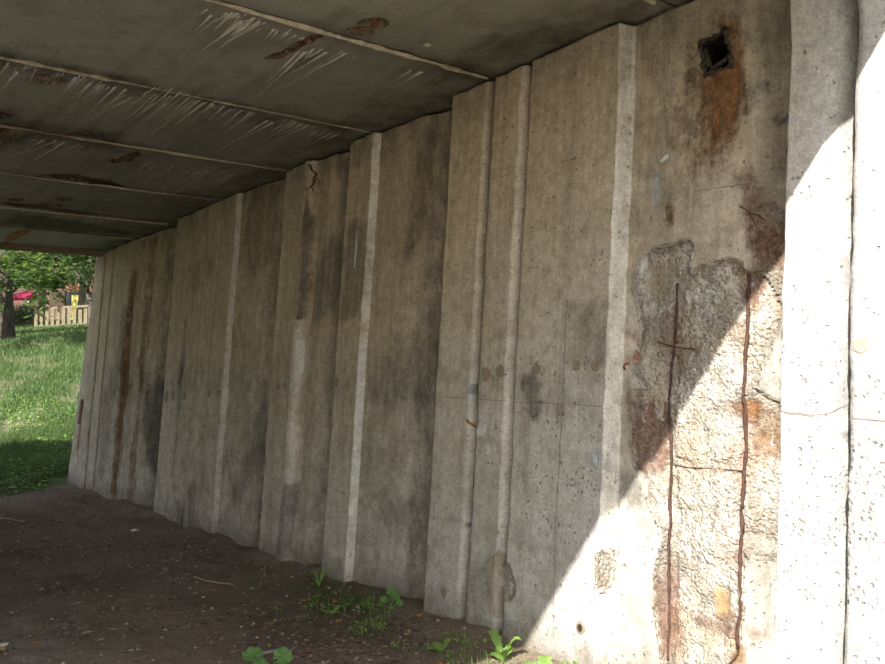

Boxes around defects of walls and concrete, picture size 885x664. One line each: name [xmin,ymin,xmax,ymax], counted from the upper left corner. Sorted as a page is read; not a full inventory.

water stain [53,72,338,139]
water stain [202,9,305,40]
spalling [264,34,323,60]
water stain [283,43,355,72]
corrosion [701,16,745,151]
spalling [36,174,130,189]
crack [307,163,320,194]
corrosion [110,272,150,494]
water stain [144,380,164,470]
corrosion [629,396,670,473]
spalling [631,238,782,664]
spalling [594,548,617,595]